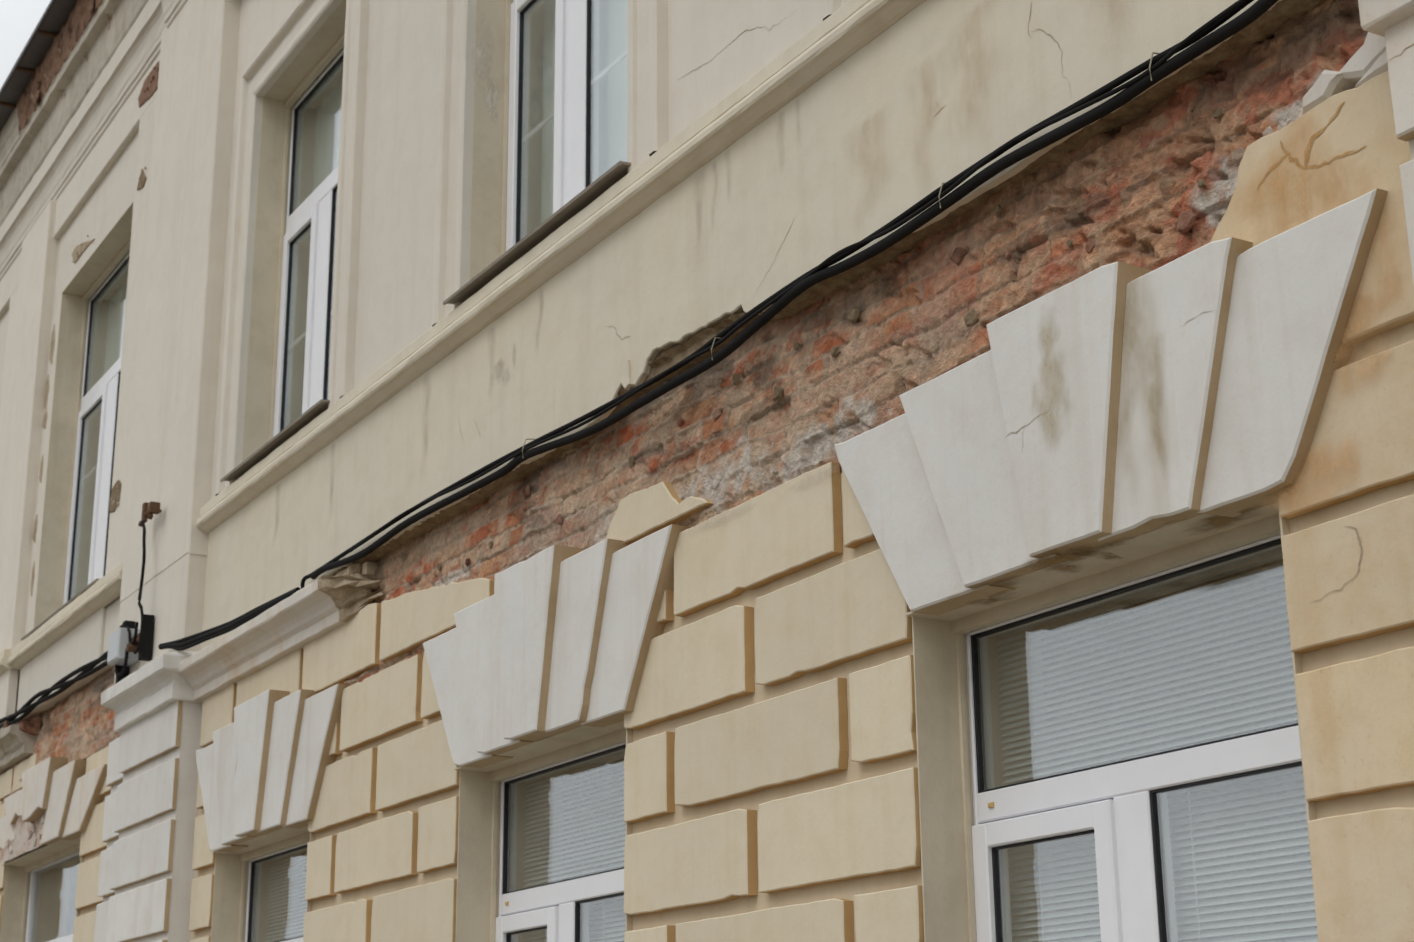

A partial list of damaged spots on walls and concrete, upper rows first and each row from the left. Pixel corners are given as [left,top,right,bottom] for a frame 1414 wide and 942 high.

crack [686,10,797,75]
flaking render [371,0,1388,604]
crack [1308,526,1362,604]
flaking render [344,640,425,686]
flaking render [0,665,121,796]